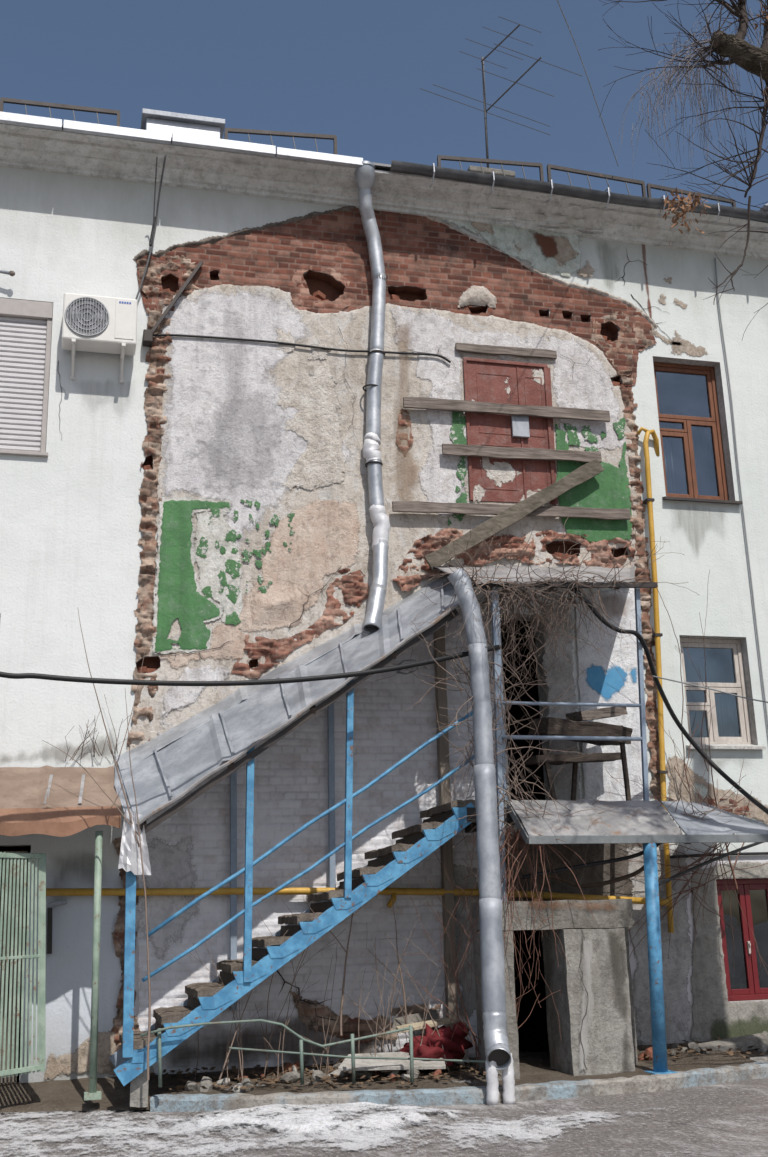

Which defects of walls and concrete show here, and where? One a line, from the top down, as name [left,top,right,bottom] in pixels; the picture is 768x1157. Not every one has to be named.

peeling [126,206,768,825]
flaking render [44,837,140,1081]
spalling [289,991,440,1044]